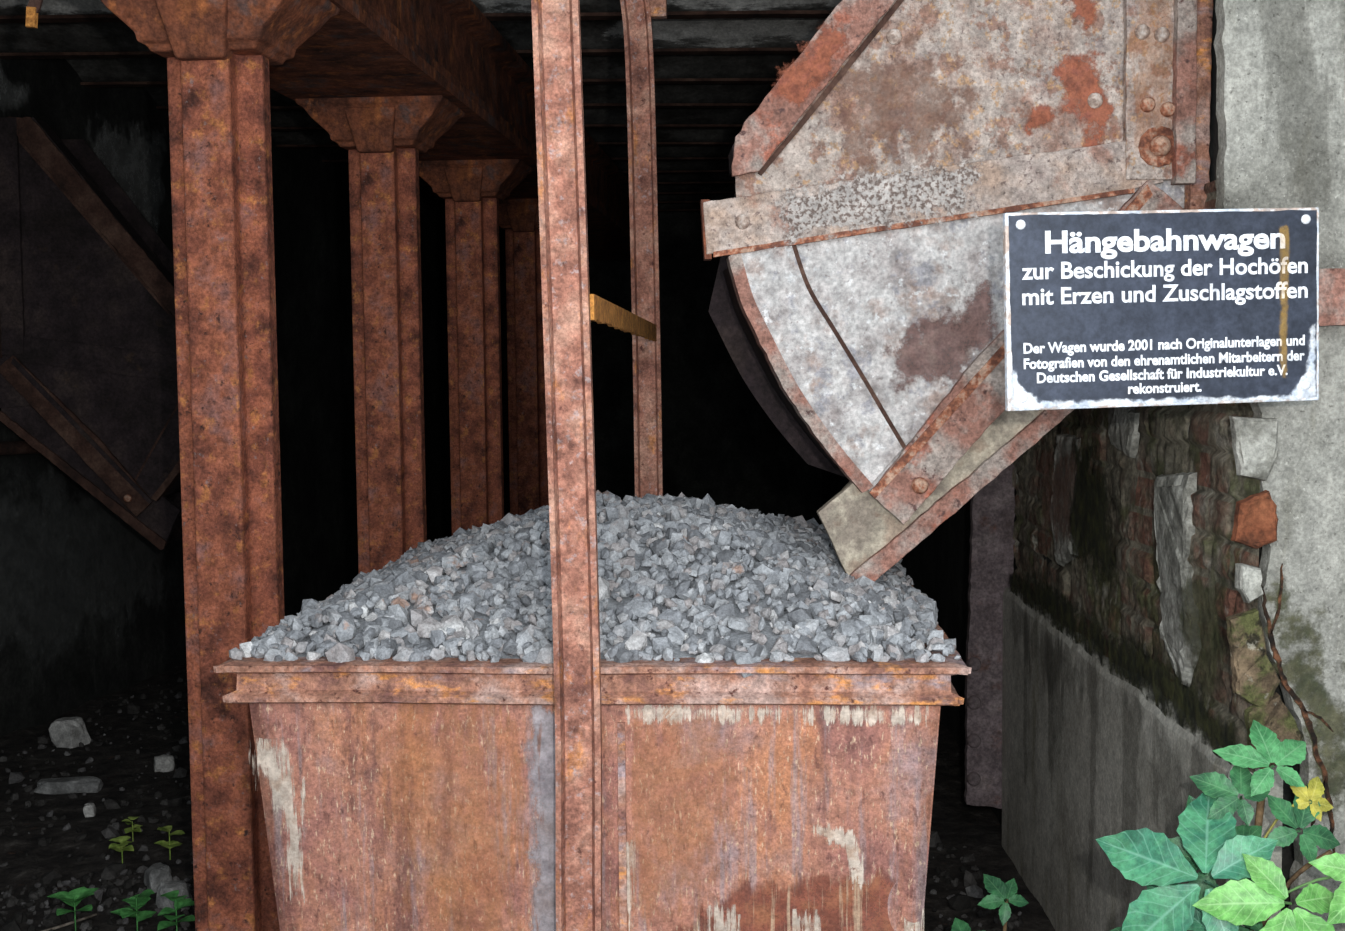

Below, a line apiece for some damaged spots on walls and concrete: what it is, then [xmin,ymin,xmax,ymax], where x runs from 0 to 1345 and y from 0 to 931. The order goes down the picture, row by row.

flaking render [1204,180,1216,209]
flaking render [1008,403,1303,765]